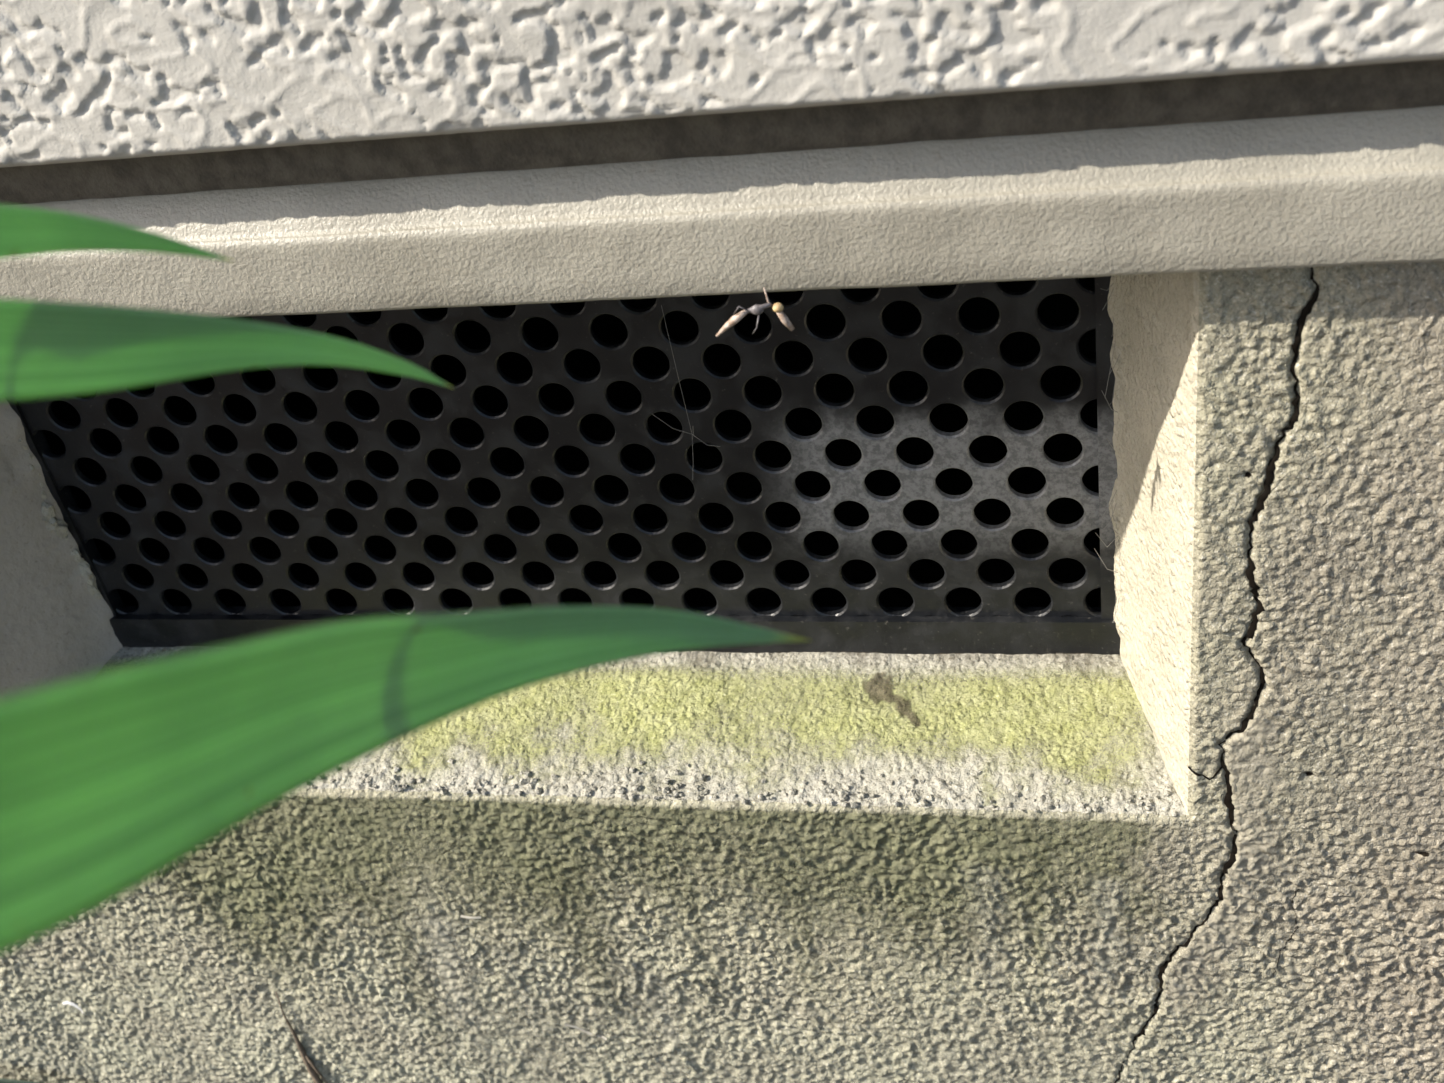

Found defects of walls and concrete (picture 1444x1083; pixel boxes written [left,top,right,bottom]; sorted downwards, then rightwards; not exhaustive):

crack [1114,267,1319,1083]
damp [425,919,479,1040]
damp [641,976,678,1072]
damp [1099,883,1118,977]